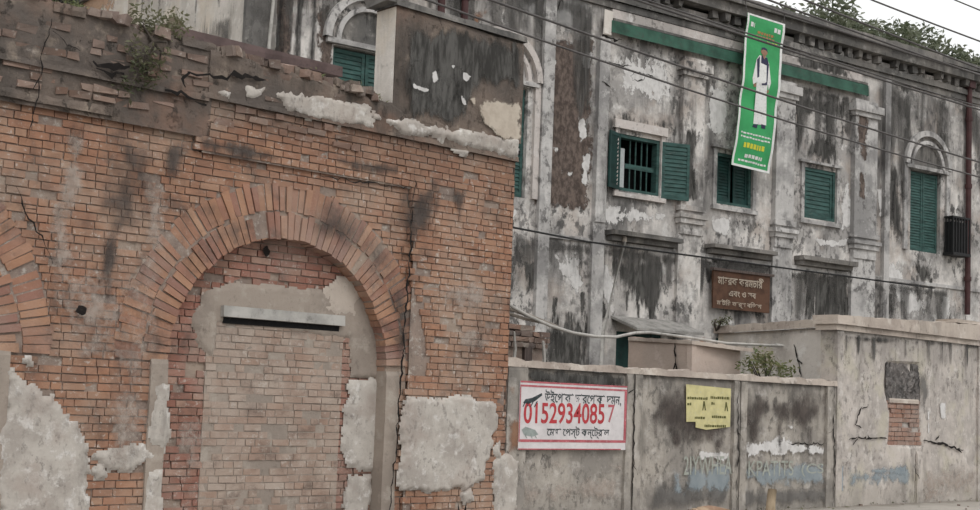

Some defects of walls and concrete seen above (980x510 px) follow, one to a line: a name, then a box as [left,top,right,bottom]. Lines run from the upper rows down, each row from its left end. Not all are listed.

crack [28,19,130,137]
crack [165,70,265,106]
damp [250,0,339,59]
flaking render [148,48,519,159]
peeling [551,39,594,210]
damp [796,88,851,165]
damp [864,79,927,239]
damp [603,250,675,319]
damp [875,263,951,320]
peeling [0,355,172,510]
peeling [340,377,377,510]
peeling [396,394,519,510]